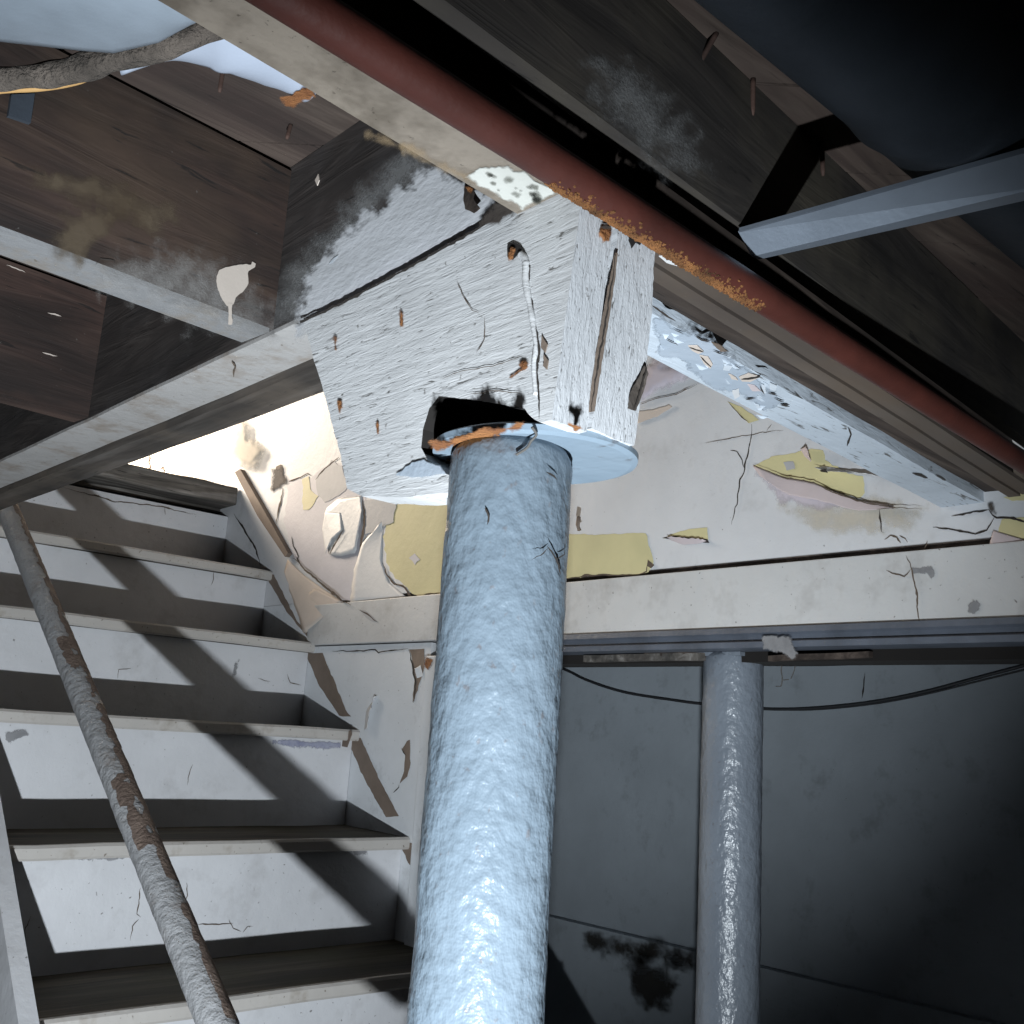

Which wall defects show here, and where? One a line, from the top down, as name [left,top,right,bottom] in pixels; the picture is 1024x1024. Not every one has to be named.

spalling [463,187,480,213]
rust [544,181,766,312]
crack [589,253,618,412]
peeling [653,317,790,423]
crack [707,424,783,525]
peeling [753,446,919,510]
peeling [271,460,447,633]
peeling [566,533,654,579]
crack [879,503,1024,619]
peeling [409,649,424,703]
peeling [400,740,411,783]
mould [586,932,694,1011]